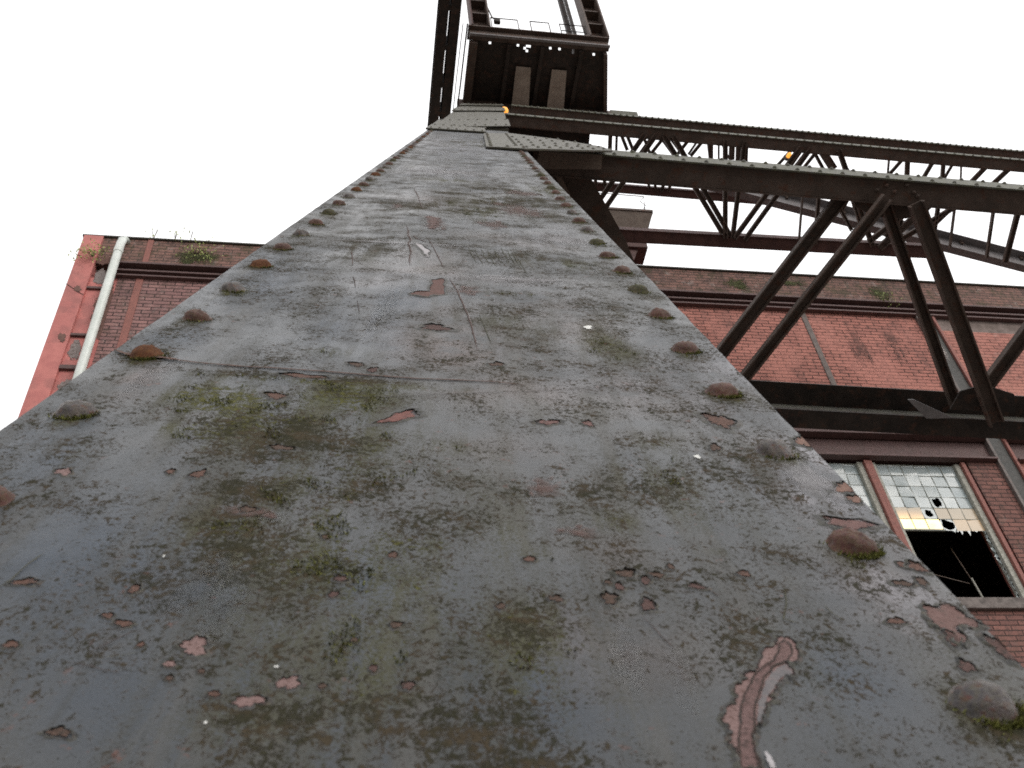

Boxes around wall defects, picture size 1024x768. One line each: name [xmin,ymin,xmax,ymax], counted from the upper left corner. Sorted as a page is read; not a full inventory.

peeling [407,278,448,298]
corrosion [344,361,381,375]
peeling [811,480,888,534]
peeling [916,601,991,650]
peeling [172,632,213,662]
peeling [223,674,306,711]
peeling [716,634,804,768]